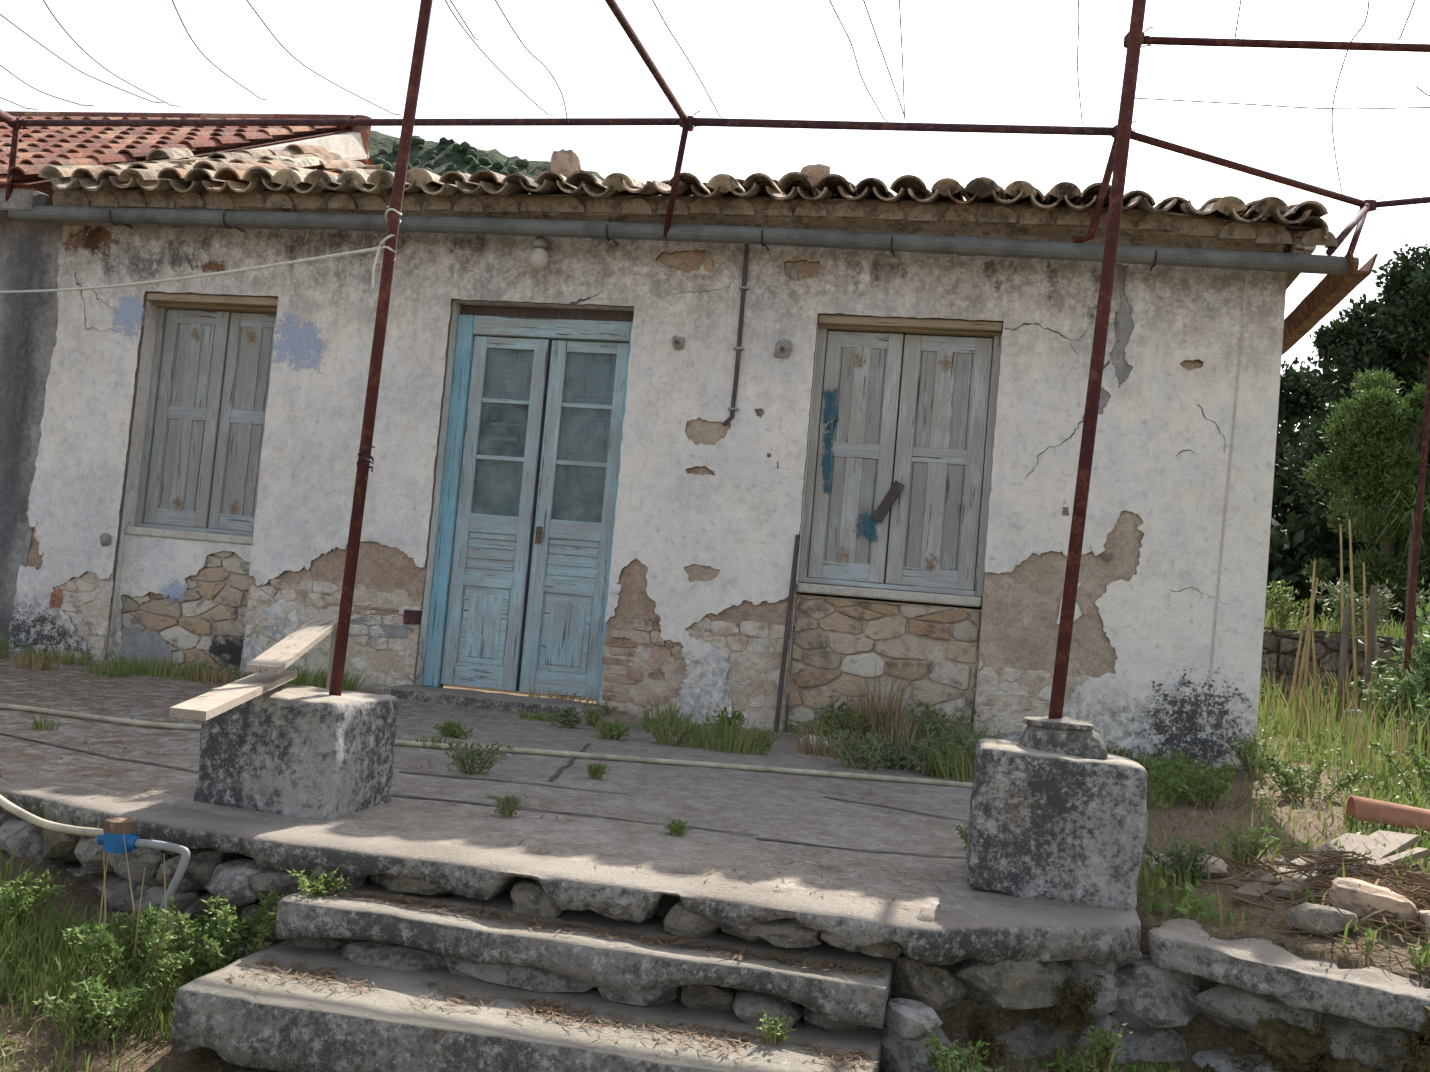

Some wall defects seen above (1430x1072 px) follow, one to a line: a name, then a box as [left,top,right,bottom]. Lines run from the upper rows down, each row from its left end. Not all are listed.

crack [1005,322,1114,369]
spalling [685,418,731,445]
crack [1026,412,1085,477]
peeling [8,519,44,569]
peeling [50,567,115,661]
peeling [240,537,426,690]
peeling [599,559,794,732]
peeling [973,511,1144,740]